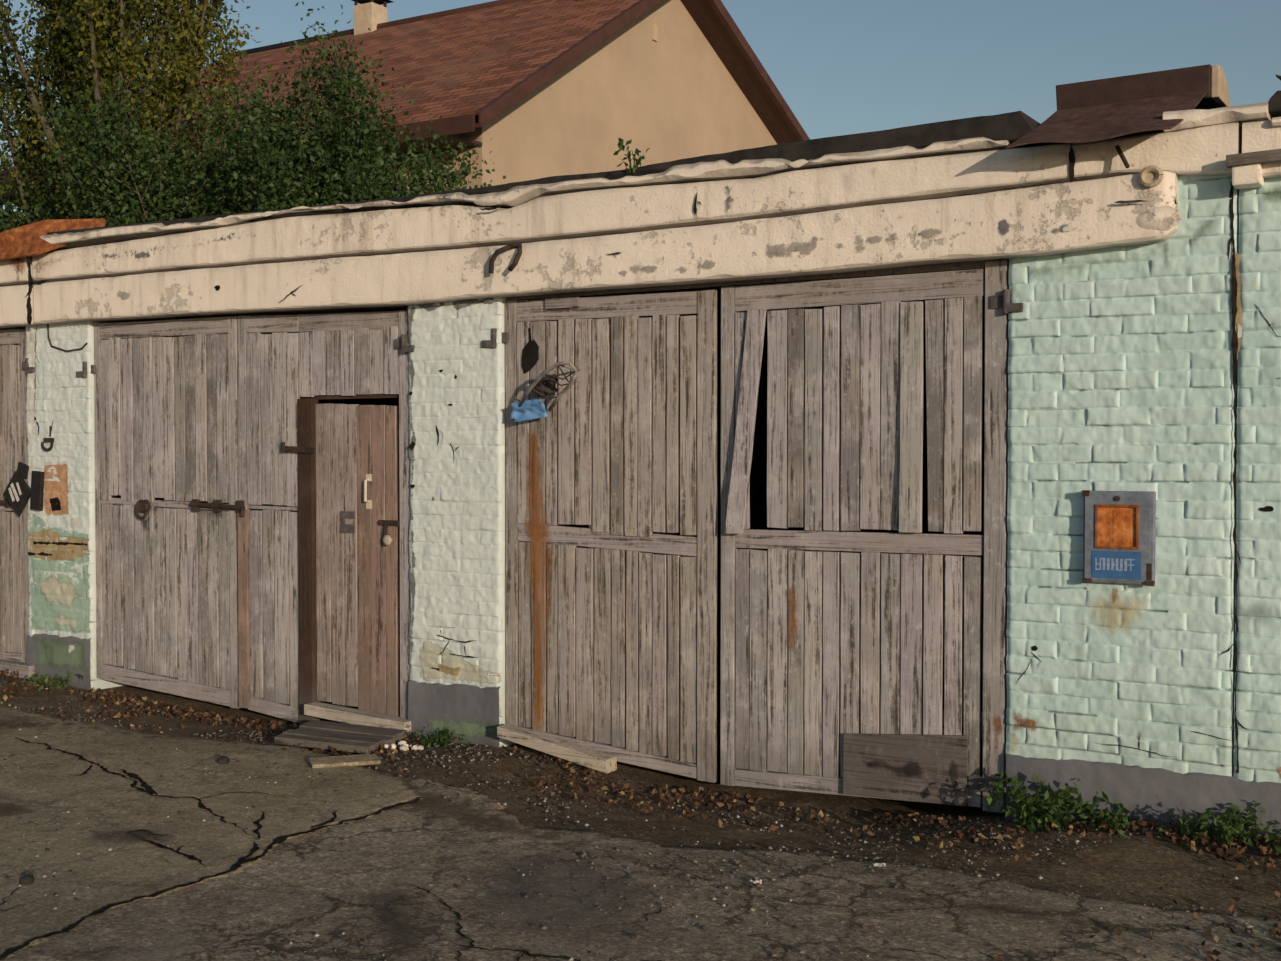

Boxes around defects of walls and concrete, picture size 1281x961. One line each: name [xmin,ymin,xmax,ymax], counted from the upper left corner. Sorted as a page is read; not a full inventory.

peeling [620,265,657,276]
peeling [677,260,715,273]
peeling [766,229,942,257]
peeling [28,461,90,653]
peeling [408,297,502,684]
rust [526,434,552,728]
crack [1191,182,1281,773]
crack [1094,734,1171,757]
crack [0,737,423,960]